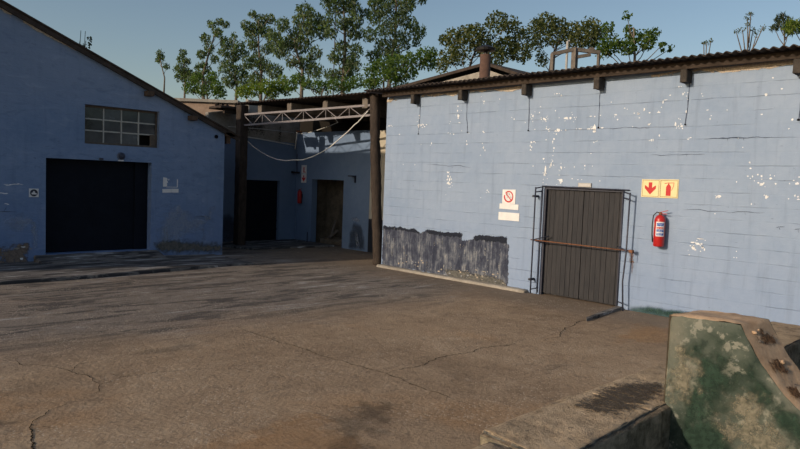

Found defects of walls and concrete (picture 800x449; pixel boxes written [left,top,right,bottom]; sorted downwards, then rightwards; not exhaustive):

crack [659,137,769,156]
damp [631,308,680,317]
damp [574,345,800,449]
crack [29,405,63,449]